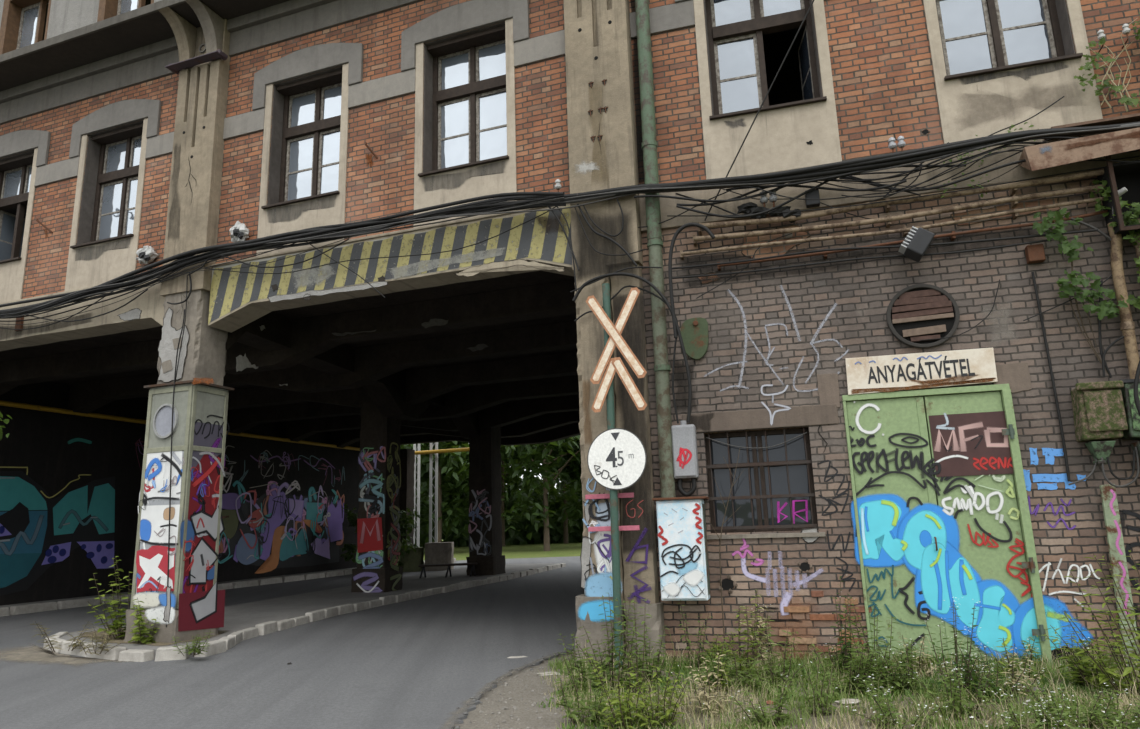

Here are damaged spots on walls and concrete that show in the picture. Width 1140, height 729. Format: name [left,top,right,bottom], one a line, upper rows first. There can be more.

corrosion [1067,131,1140,149]
spalling [158,307,190,383]
peeling [236,354,258,372]
corrosion [852,374,995,394]